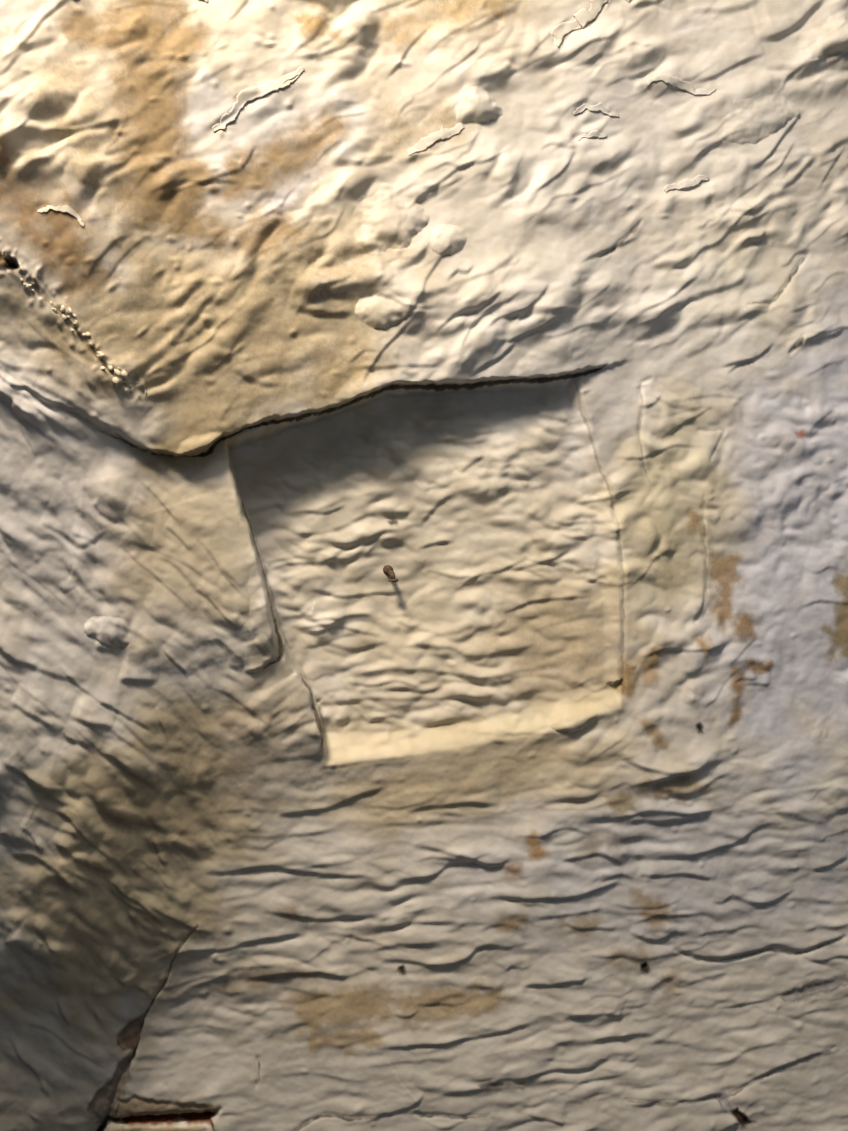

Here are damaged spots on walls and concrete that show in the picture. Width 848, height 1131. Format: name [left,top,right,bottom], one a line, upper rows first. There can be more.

damp [63,0,344,253]
damp [0,136,109,299]
damp [102,259,367,429]
crack [193,368,602,457]
crack [129,966,171,1063]
crack [97,1101,128,1131]